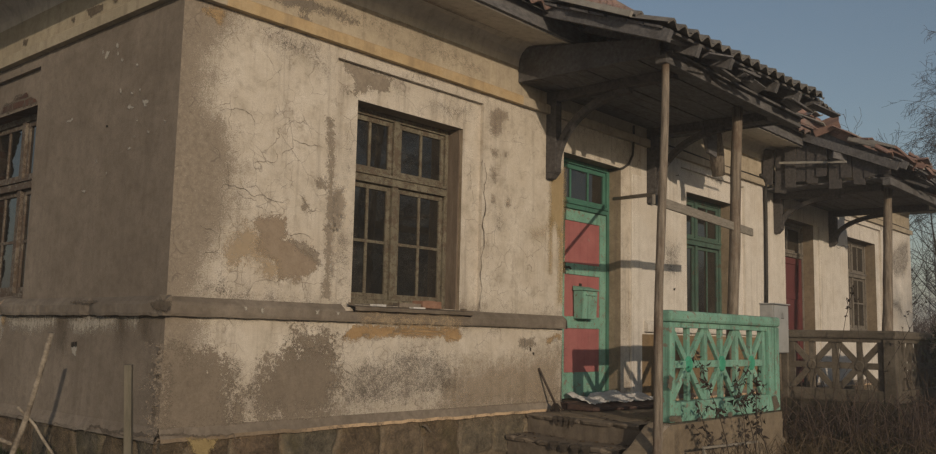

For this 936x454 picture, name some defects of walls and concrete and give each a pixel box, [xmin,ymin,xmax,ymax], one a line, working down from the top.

peeling [270,0,360,25]
peeling [344,61,393,97]
crack [222,163,320,236]
peeling [223,115,350,298]
crack [470,163,487,300]
leakage [0,315,54,341]
leakage [68,316,139,335]
peeling [341,312,463,343]
leakage [141,320,455,450]